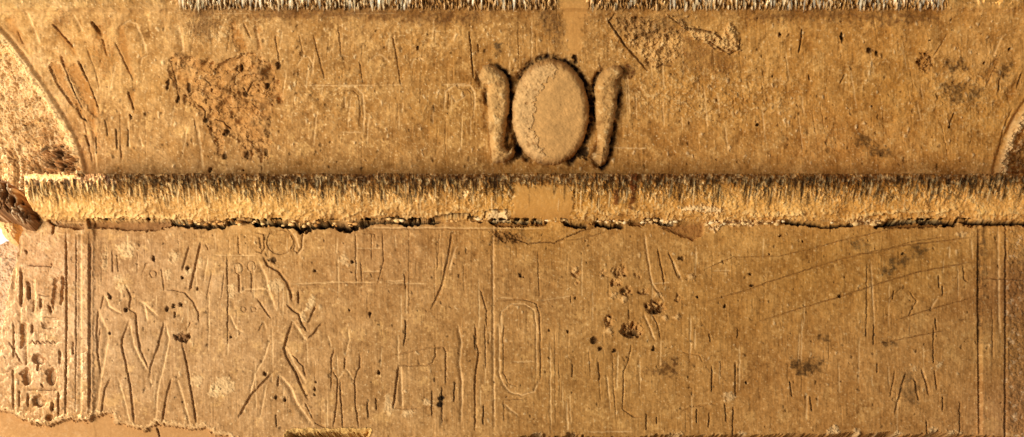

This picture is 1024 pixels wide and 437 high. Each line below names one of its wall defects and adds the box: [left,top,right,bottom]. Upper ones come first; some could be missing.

spalling [618,16,743,68]
spalling [166,52,283,173]
spalling [598,267,701,339]